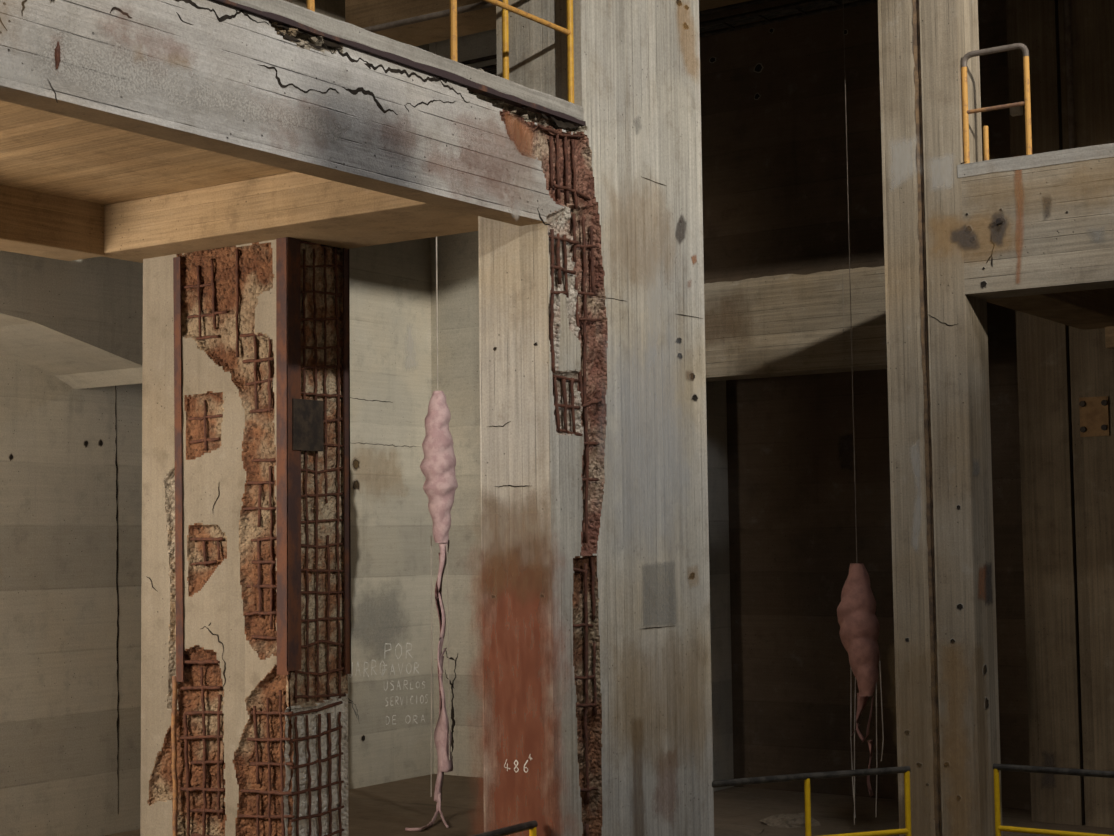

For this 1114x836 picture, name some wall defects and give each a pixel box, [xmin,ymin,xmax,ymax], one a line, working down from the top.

crack [0,0,27,31]
crack [110,7,132,18]
crack [175,0,269,25]
crack [257,40,468,115]
spalling [461,85,608,836]
spalling [147,241,365,836]
crack [445,651,458,759]
corrosion [474,549,561,836]